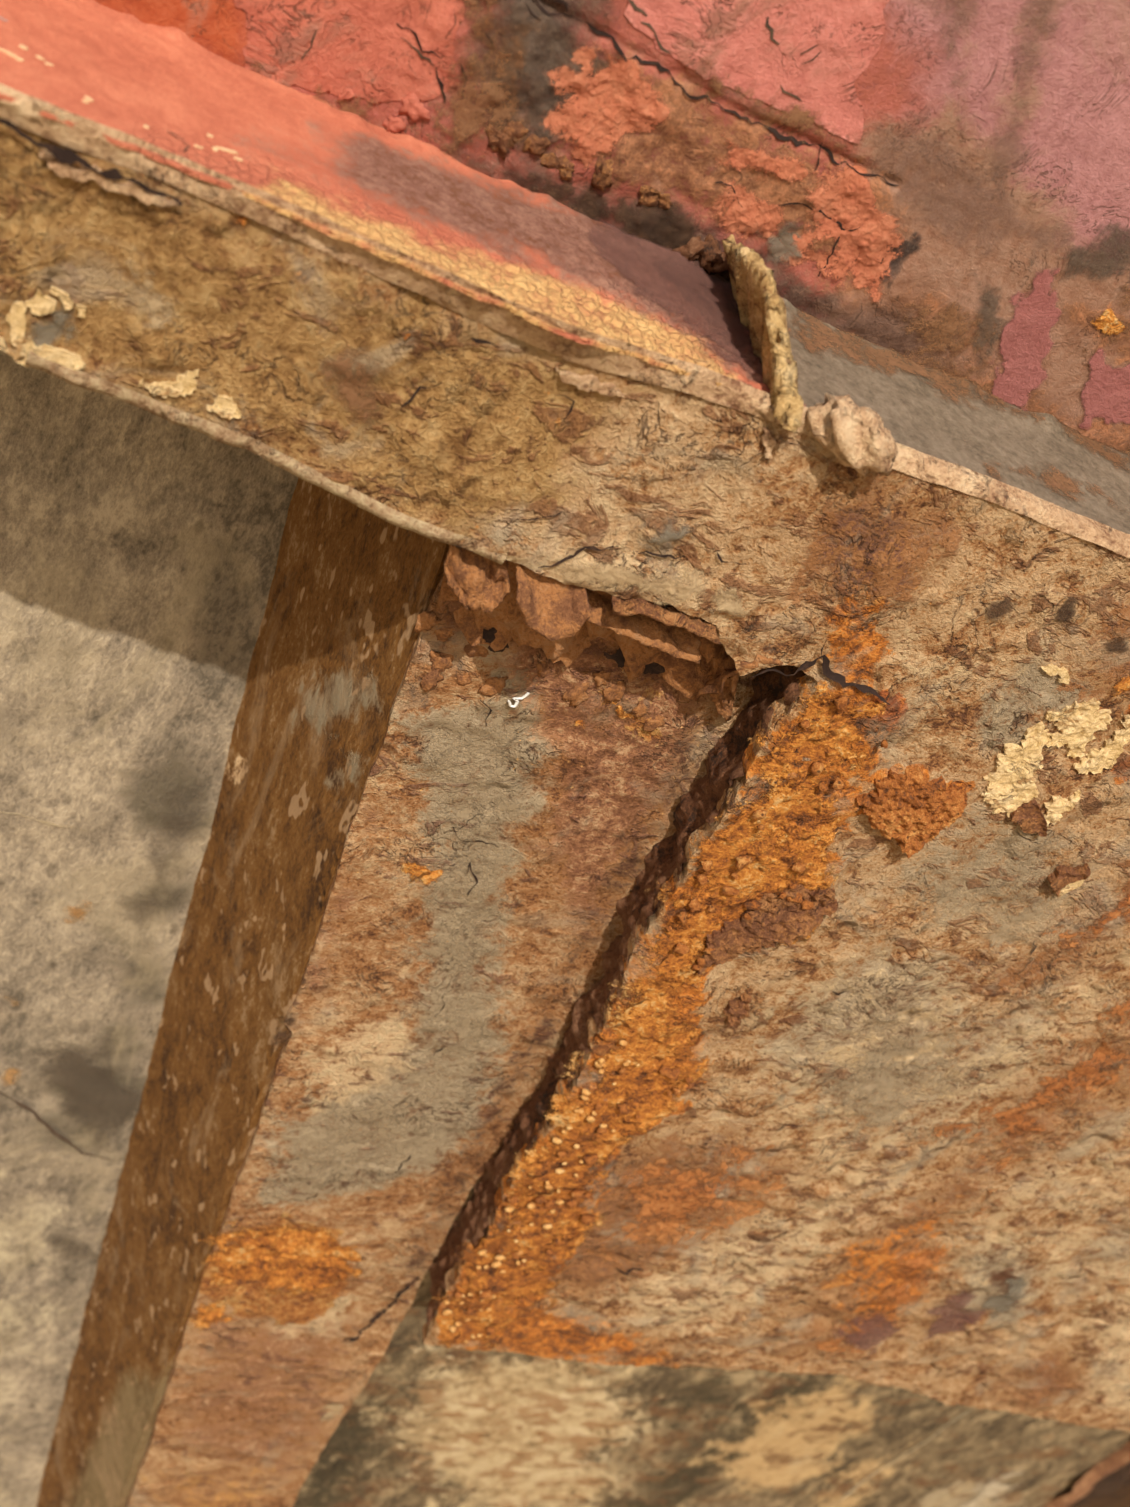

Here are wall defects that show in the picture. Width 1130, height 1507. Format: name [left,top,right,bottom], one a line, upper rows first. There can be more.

crack [396,23,493,104]
leakage [478,0,609,137]
corrosion [39,149,178,207]
corrosion [382,0,907,386]
crack [526,0,899,277]
leakage [1066,224,1130,278]
peeling [0,286,87,371]
peeling [138,369,199,398]
crack [751,640,890,705]
peeling [980,697,1130,827]
corrosion [431,671,886,1349]
leakage [604,1367,827,1507]